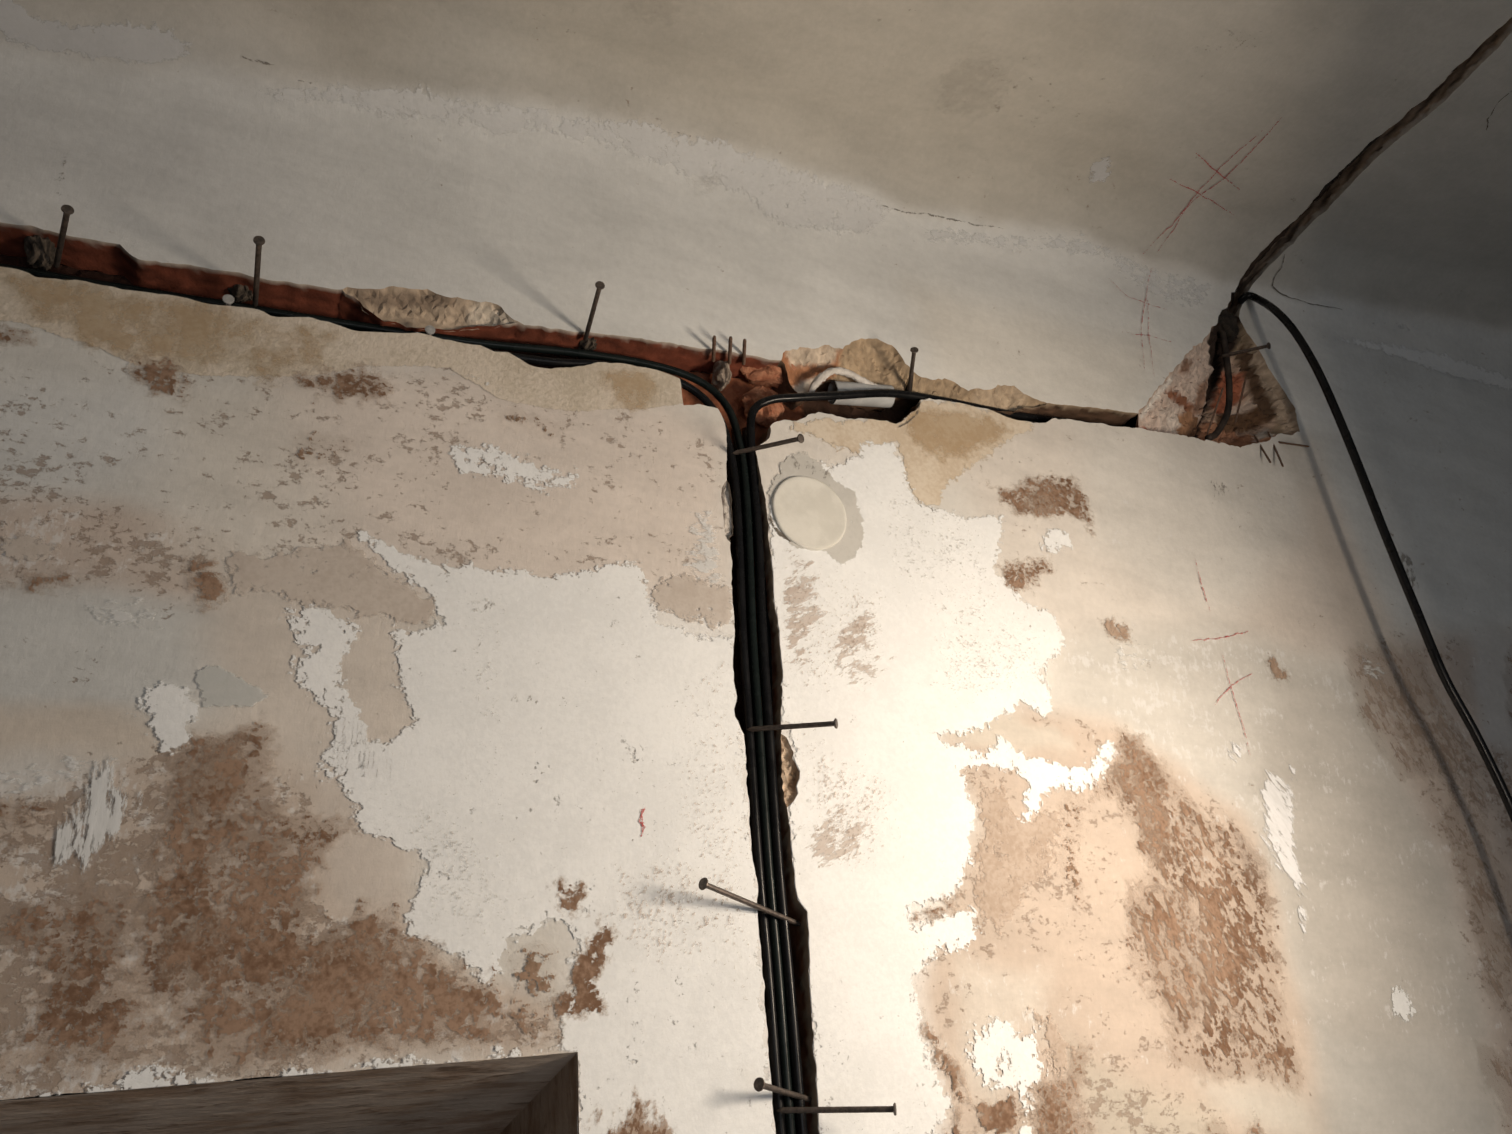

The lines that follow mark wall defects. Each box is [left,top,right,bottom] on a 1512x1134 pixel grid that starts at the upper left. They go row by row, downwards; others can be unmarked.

spalling [342,286,518,332]
peeling [131,358,190,398]
peeling [297,369,393,404]
spalling [781,338,1047,411]
spalling [1135,314,1300,448]
spalling [721,480,732,542]
peeling [998,458,1093,531]
peeling [911,777,1088,936]
peeling [0,722,614,1080]
peeling [1091,732,1304,1088]
peeling [920,1007,1093,1134]
peeling [596,1093,672,1134]